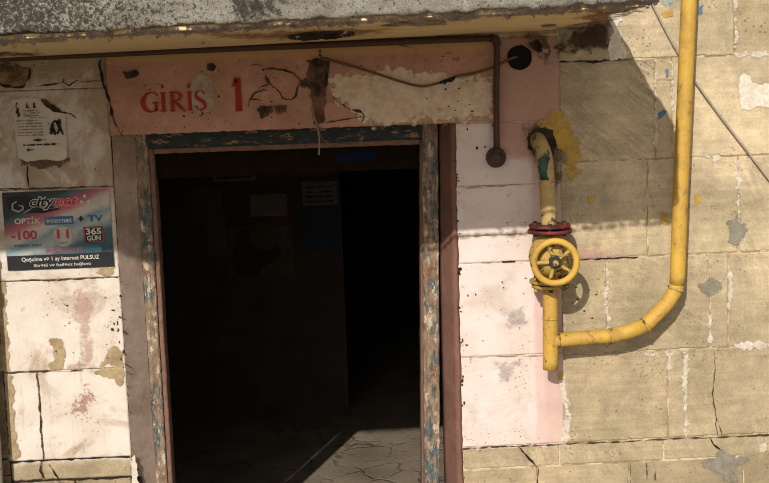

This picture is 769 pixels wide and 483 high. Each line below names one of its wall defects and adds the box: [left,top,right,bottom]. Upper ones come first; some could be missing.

spalling [277,30,362,41]
crack [31,59,123,136]
crack [248,64,307,107]
flaking render [738,73,769,111]
hole [527,127,556,155]
peeling [48,338,74,370]